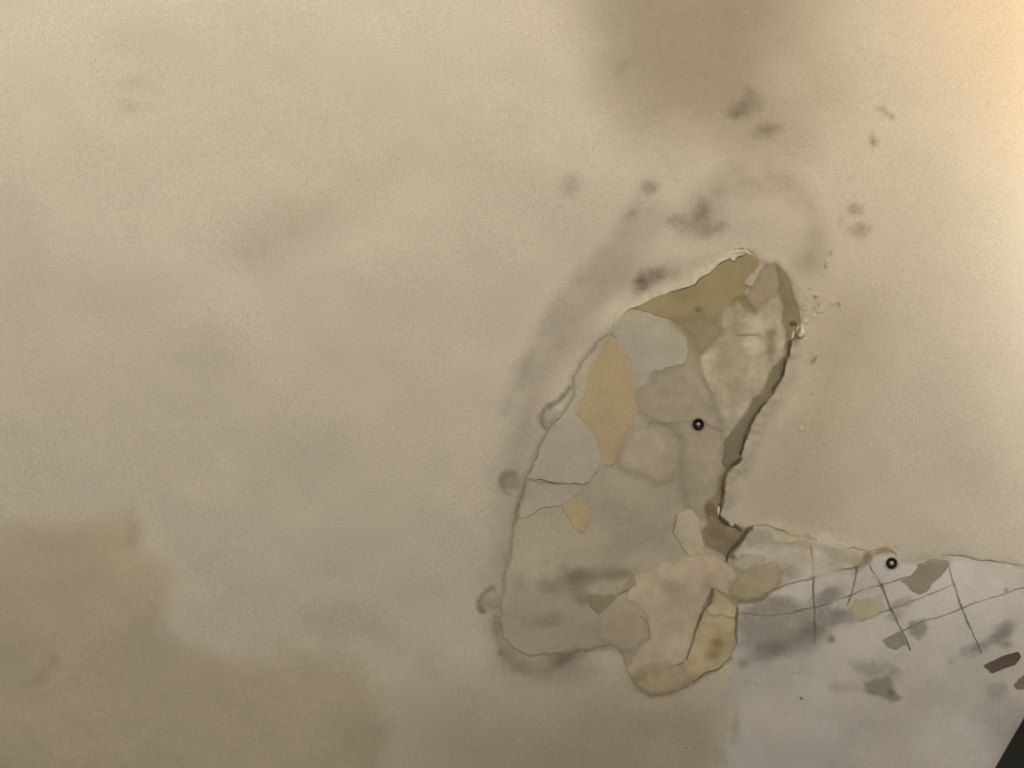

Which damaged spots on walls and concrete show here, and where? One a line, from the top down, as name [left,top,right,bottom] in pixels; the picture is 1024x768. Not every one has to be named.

crack [718,321,801,562]
peeling [500,248,1024,768]
crack [771,544,930,650]
crack [950,573,982,654]